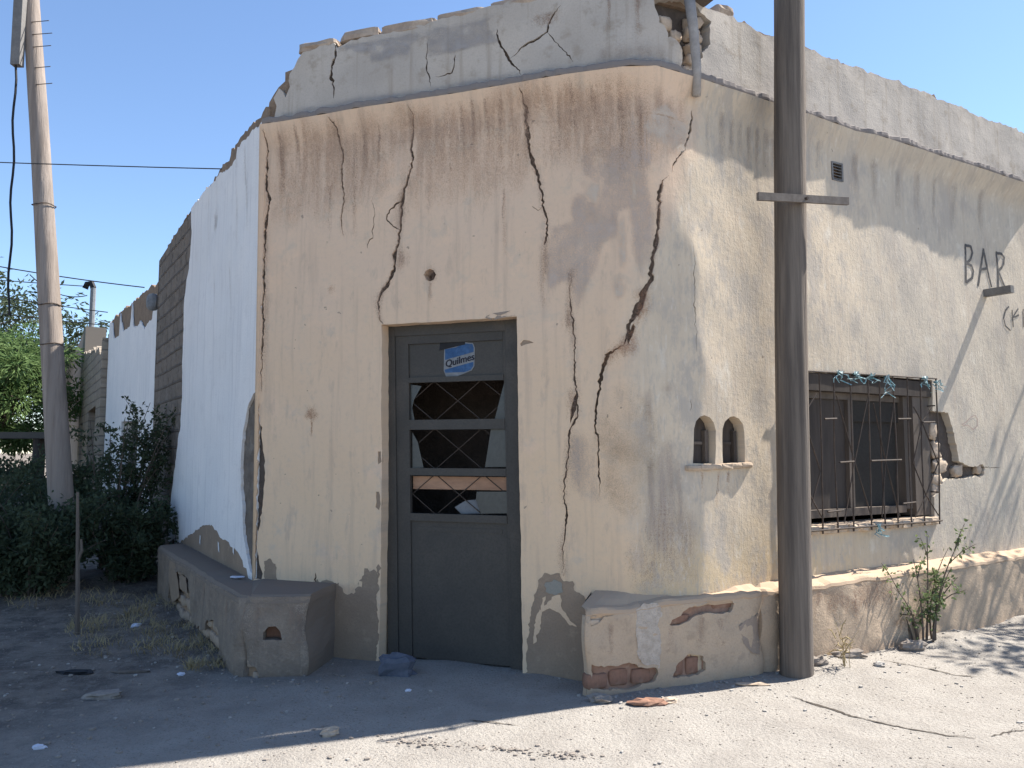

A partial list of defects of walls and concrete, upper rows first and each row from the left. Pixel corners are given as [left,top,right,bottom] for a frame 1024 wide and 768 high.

spalling [150,211,192,505]
peeling [151,396,277,653]
crack [259,137,272,390]
crack [329,44,337,91]
crack [331,121,346,230]
peeling [316,564,381,661]
crack [367,111,417,322]
leakage [257,1,713,253]
crack [497,13,692,575]
peeling [526,573,732,690]
spalling [655,4,704,70]
spalling [929,412,982,495]